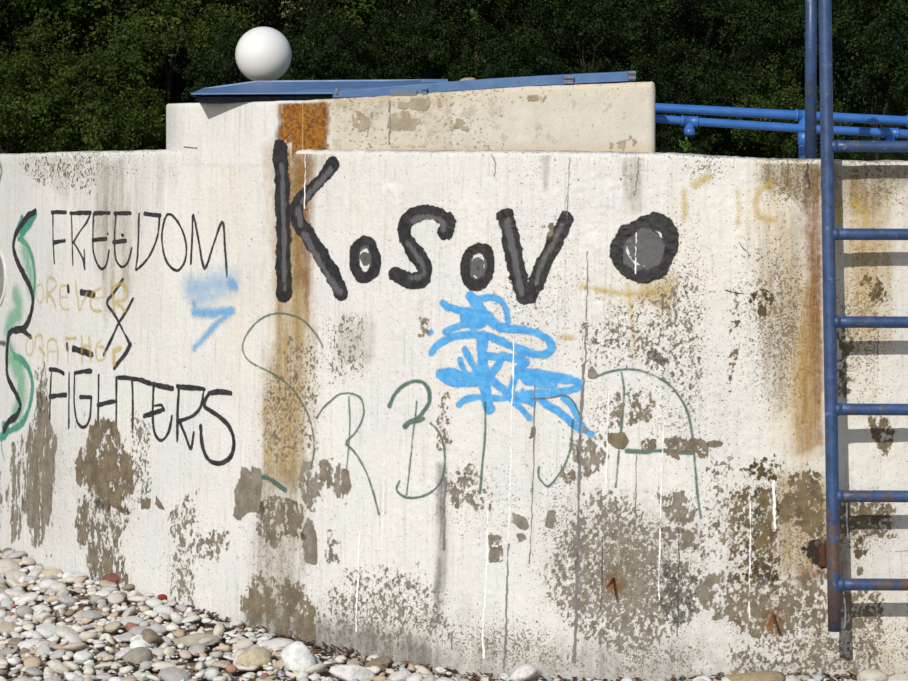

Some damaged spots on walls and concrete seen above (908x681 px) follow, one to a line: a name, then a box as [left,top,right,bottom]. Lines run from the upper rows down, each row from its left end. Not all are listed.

rust [277,102,329,205]
rust [263,222,306,485]
rust [811,171,821,363]
leakage [317,531,377,657]